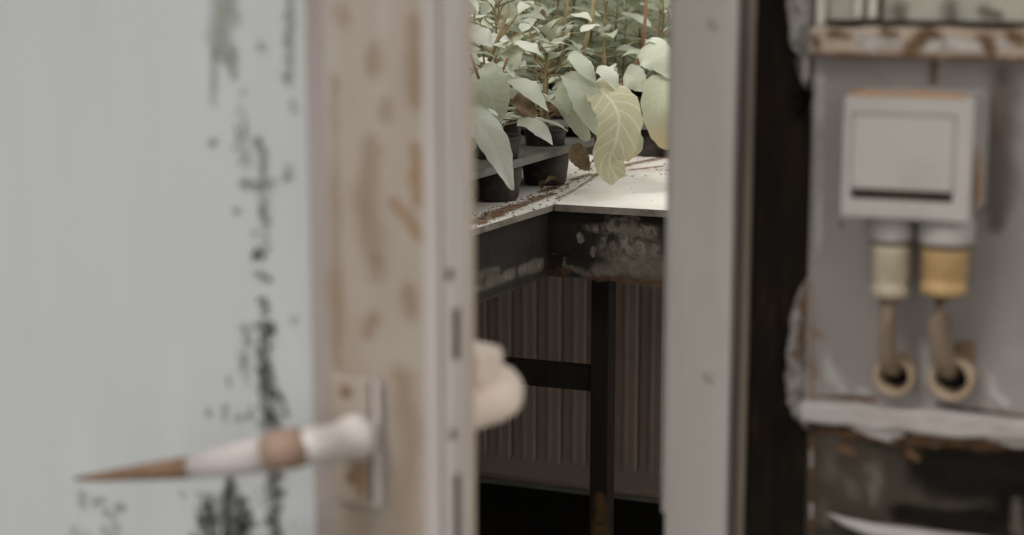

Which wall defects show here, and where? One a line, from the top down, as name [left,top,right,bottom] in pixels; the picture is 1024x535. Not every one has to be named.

damp [246,297,288,431]
spalling [785,277,808,430]
spalling [850,426,907,442]
damp [191,472,293,535]